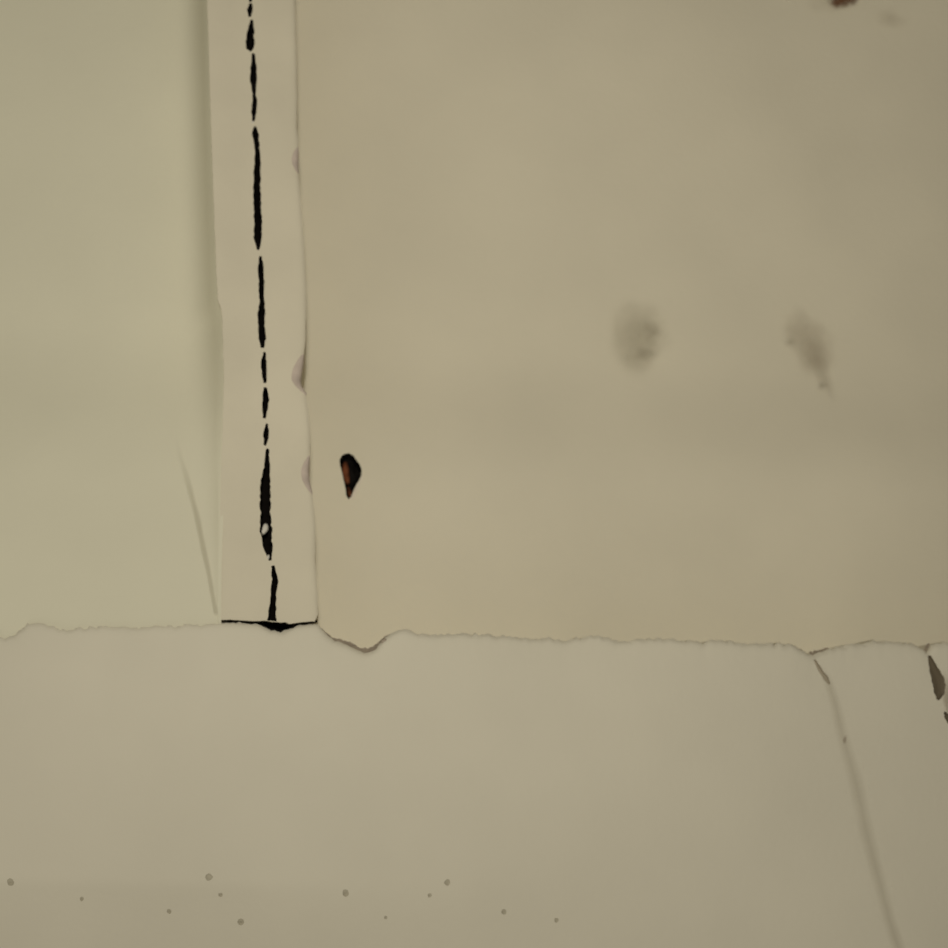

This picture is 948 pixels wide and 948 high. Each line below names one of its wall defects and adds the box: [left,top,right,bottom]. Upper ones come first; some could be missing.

crack [246,0,278,621]
crack [814,659,830,685]
crack [928,655,948,723]